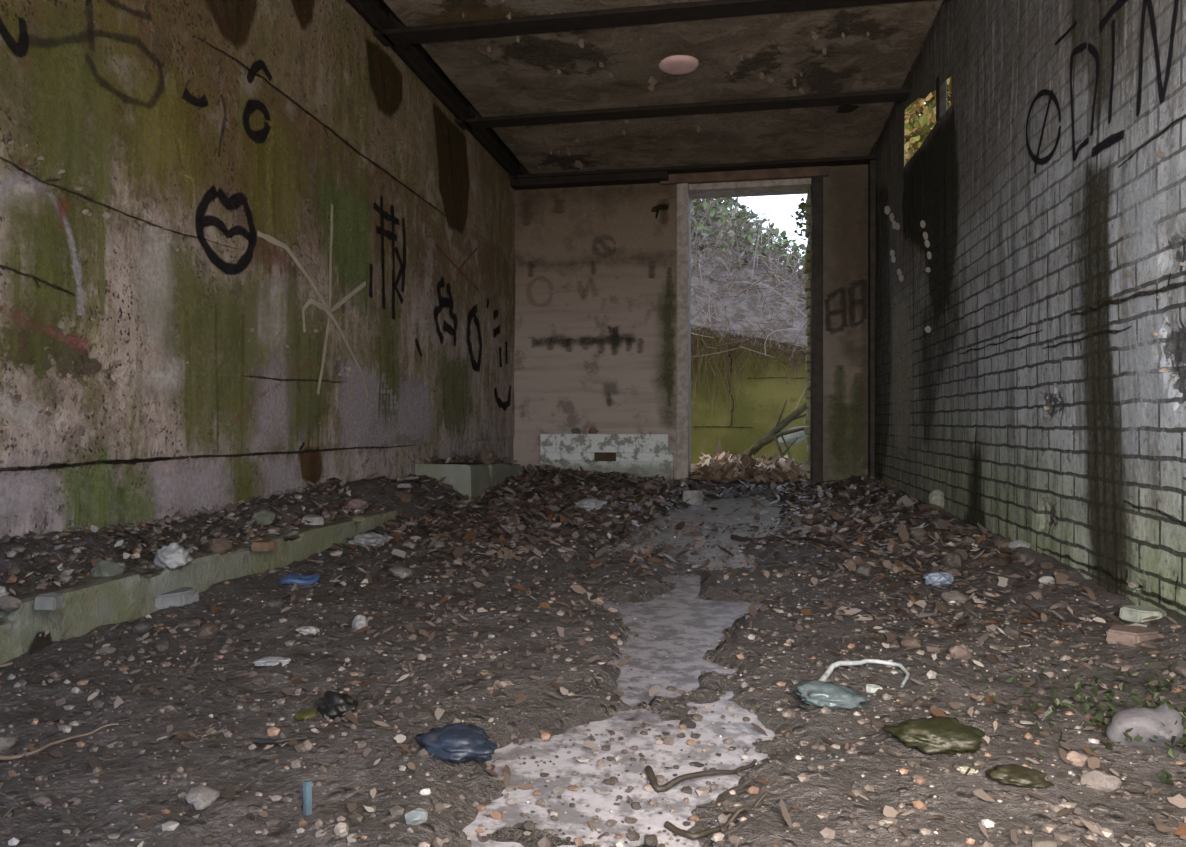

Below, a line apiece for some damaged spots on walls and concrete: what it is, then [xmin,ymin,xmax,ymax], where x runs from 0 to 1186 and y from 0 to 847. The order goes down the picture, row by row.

leakage [292,0,315,28]
leakage [366,41,402,117]
leakage [1,11,206,382]
leakage [237,98,307,259]
leakage [433,104,469,233]
leakage [165,246,270,502]
leakage [286,175,401,452]
leakage [829,108,959,480]
leakage [1073,0,1127,597]
leakage [63,450,154,530]
crack [0,442,415,471]